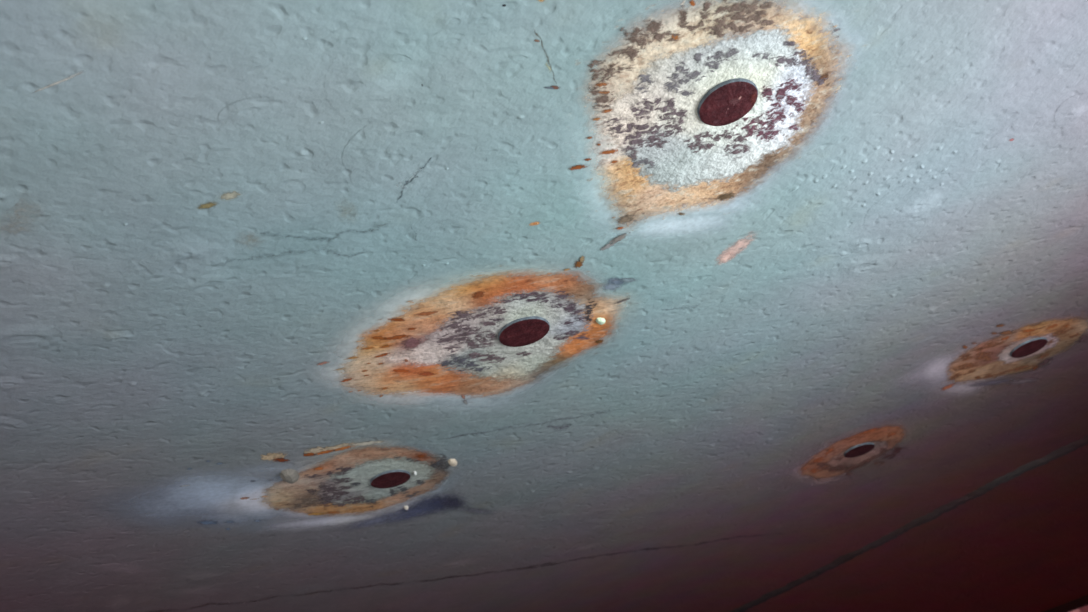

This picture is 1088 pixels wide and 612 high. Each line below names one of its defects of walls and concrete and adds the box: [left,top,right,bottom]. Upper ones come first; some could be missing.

corrosion [570,0,851,250]
corrosion [318,256,630,404]
corrosion [916,318,1088,390]
corrosion [133,441,449,530]
corrosion [801,426,908,481]